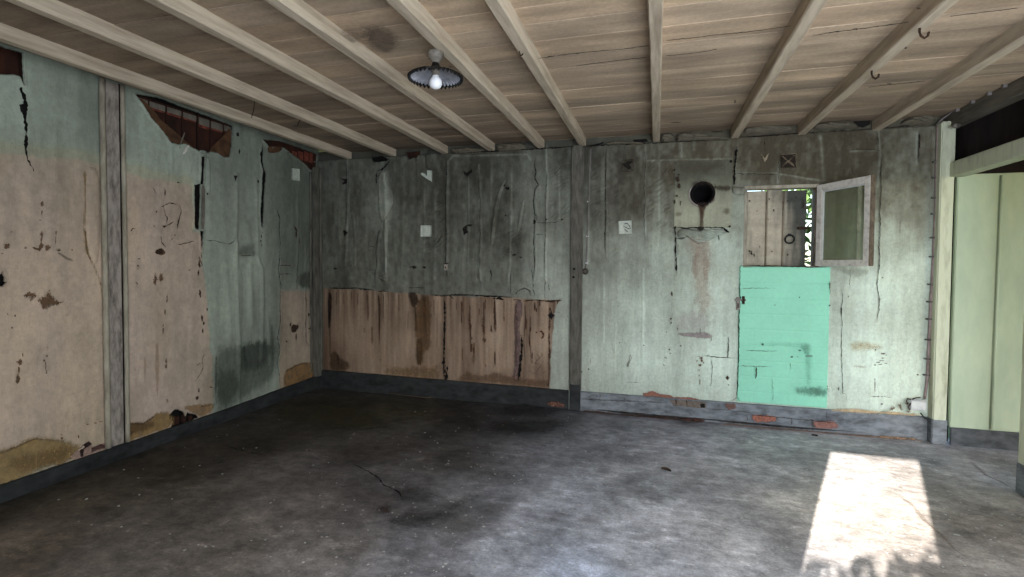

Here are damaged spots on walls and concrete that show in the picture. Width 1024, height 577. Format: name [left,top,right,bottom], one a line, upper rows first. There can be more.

corrosion [698,202,709,231]
leakage [328,293,349,370]
leakage [398,292,431,364]
leakage [461,300,542,386]
spalling [643,390,706,408]
spalling [752,414,777,423]
leakage [0,438,79,485]
crack [354,464,403,500]